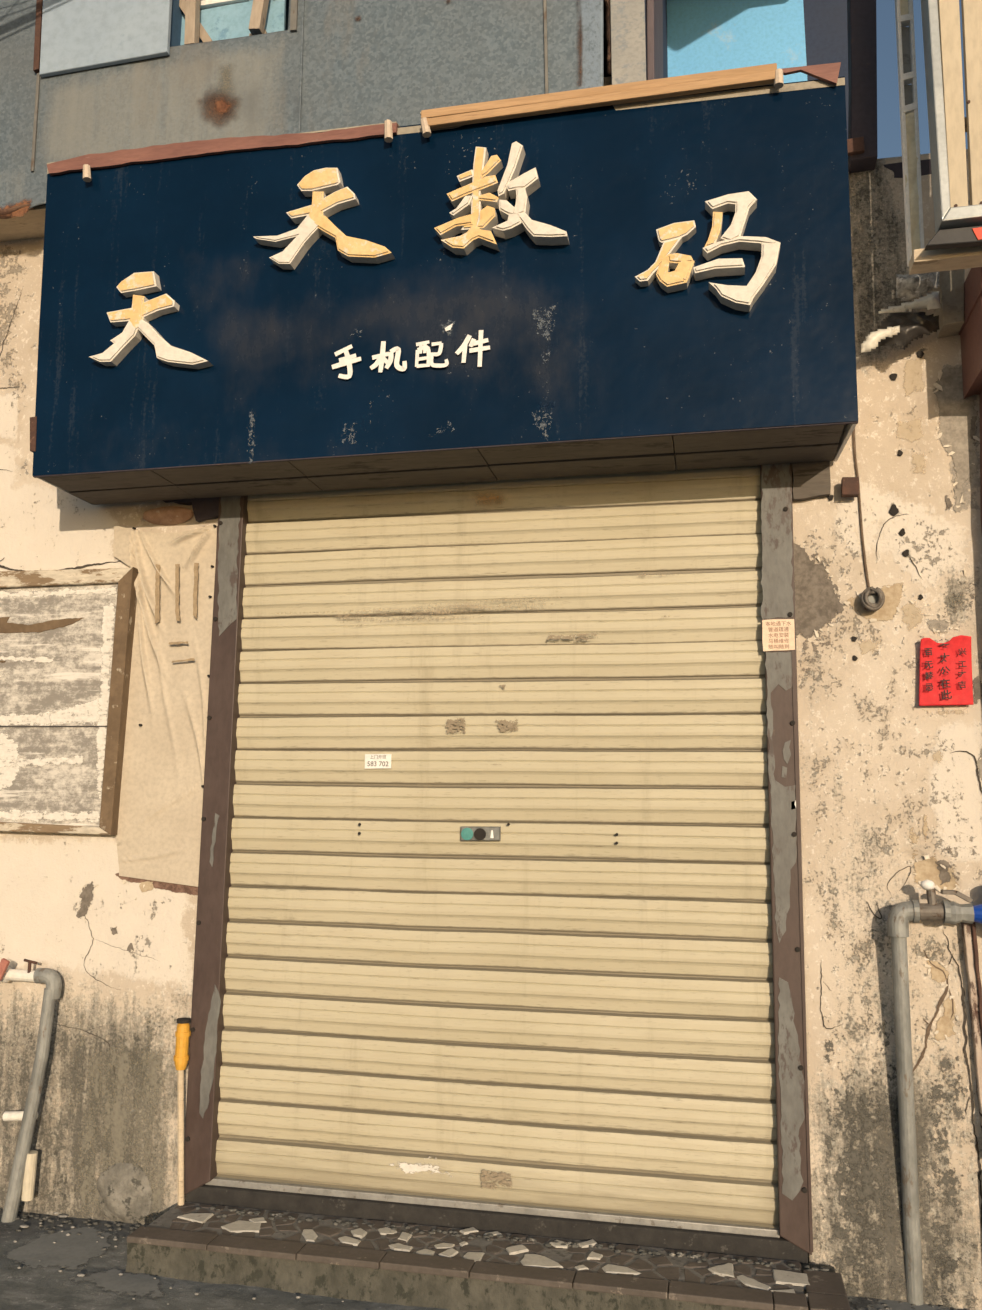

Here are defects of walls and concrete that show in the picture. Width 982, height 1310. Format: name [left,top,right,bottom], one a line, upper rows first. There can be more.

corrosion [204,69,237,124]
peeling [761,463,950,943]
peeling [973,676,982,709]
spalling [912,847,960,892]
damp [70,1014,176,1225]
peeling [778,977,805,1200]
damp [813,1021,907,1308]
crack [913,931,982,1228]
damp [919,1056,982,1310]